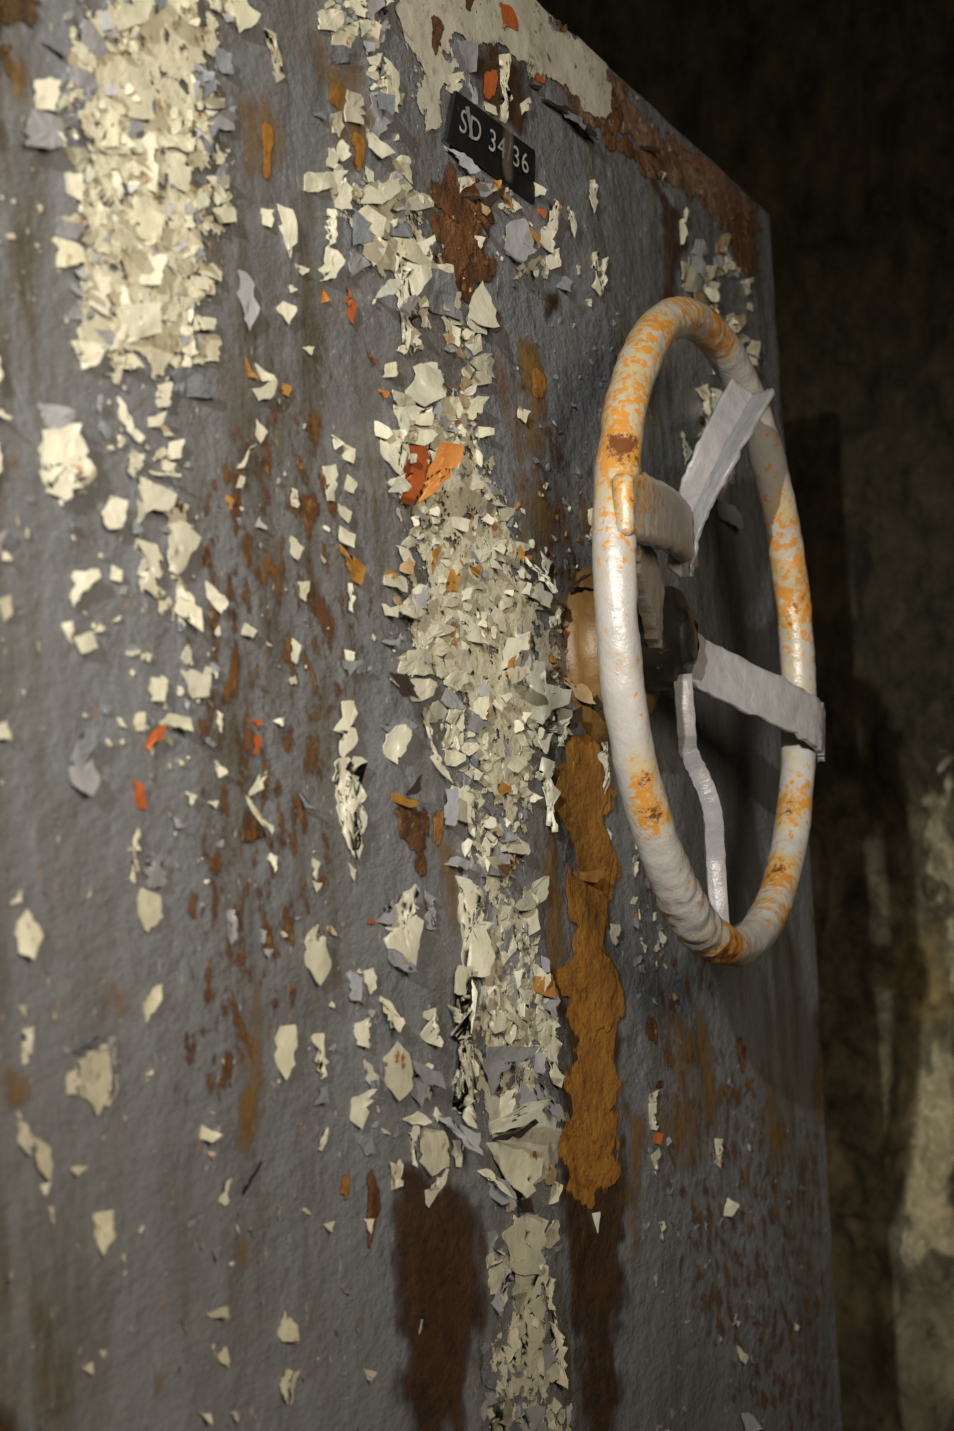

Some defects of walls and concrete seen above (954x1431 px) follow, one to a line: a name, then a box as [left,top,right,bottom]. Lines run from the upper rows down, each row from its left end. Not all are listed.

corrosion [0,0,42,95]
corrosion [534,2,763,299]
peeling [0,0,612,1431]
corrosion [383,724,412,764]
corrosion [391,792,456,907]
peeling [610,846,684,1048]
corrosion [547,734,648,1431]
peeling [643,1080,683,1195]
peeling [690,1138,723,1179]
peeling [644,1183,805,1241]
corrosion [651,951,834,1431]
peeling [726,1407,765,1431]